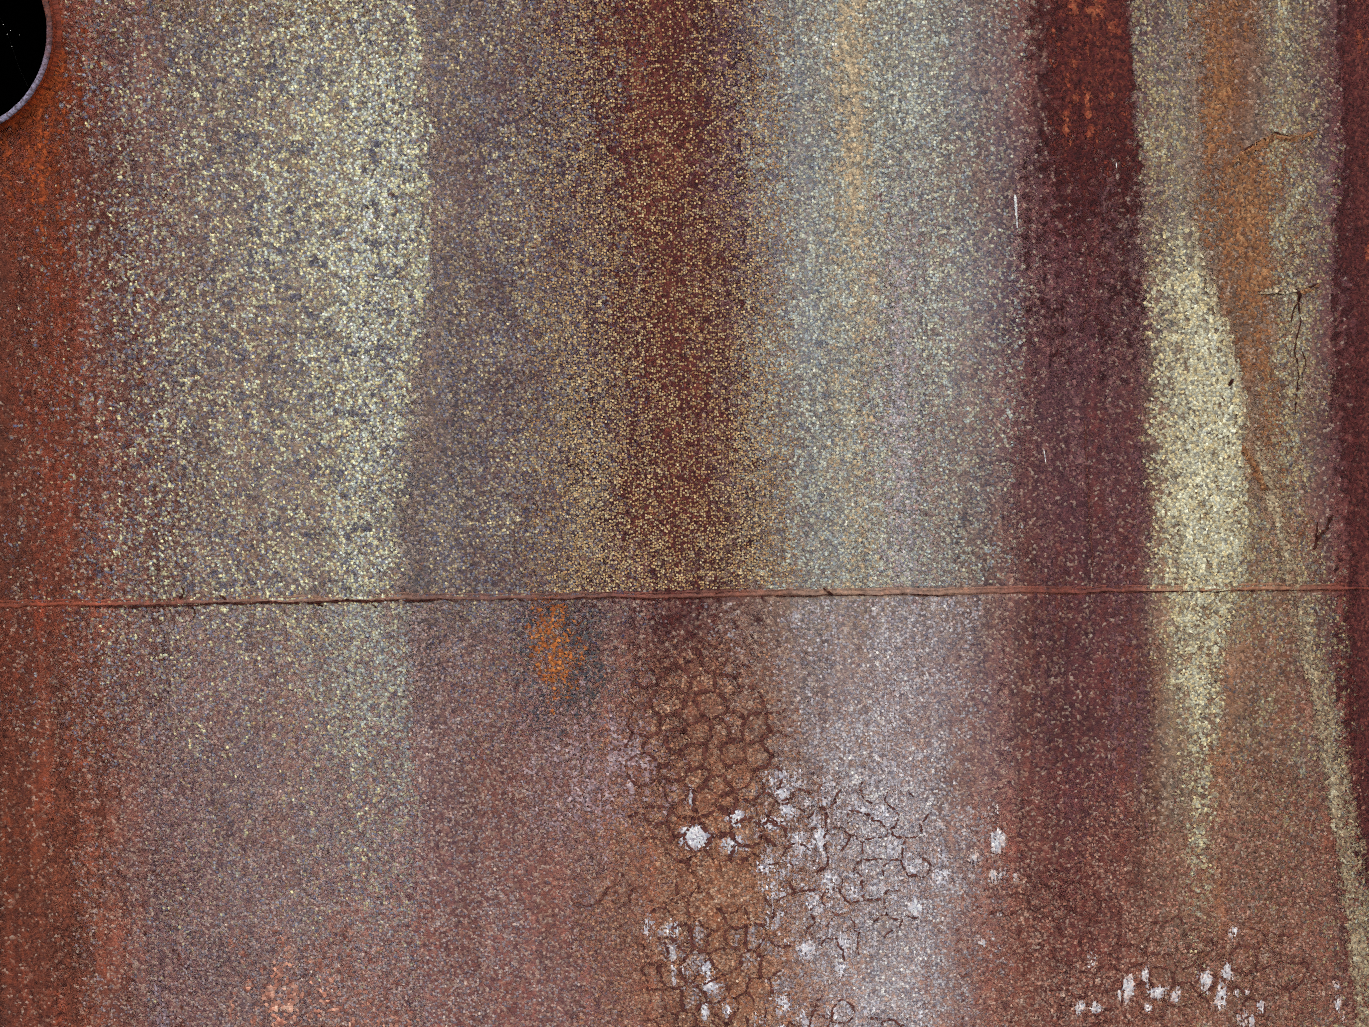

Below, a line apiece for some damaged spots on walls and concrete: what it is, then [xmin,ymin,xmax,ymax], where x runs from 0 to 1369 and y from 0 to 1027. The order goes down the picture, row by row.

rust [0,1,199,1027]
rust [225,928,421,1027]
rust [506,0,834,1027]
crack [570,644,953,1027]
damp [701,0,1040,1027]
crack [987,864,1325,1027]
rust [954,0,1369,1027]
damp [1127,0,1369,1027]